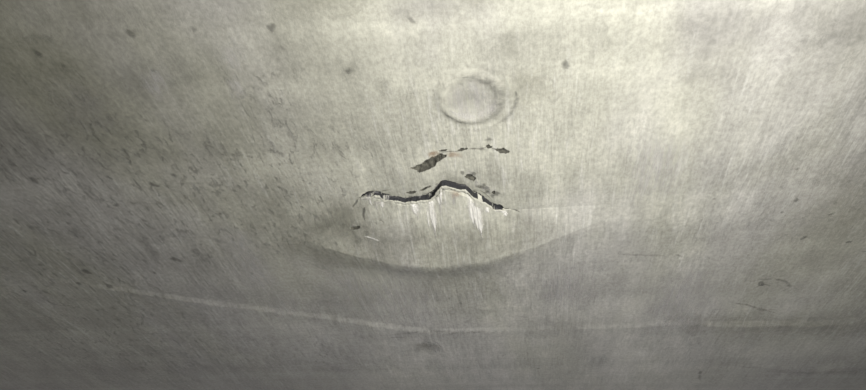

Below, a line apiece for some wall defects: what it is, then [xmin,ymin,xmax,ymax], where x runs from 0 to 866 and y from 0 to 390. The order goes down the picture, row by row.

damp [412,190,442,231]
crack [356,180,521,220]
damp [469,196,489,233]